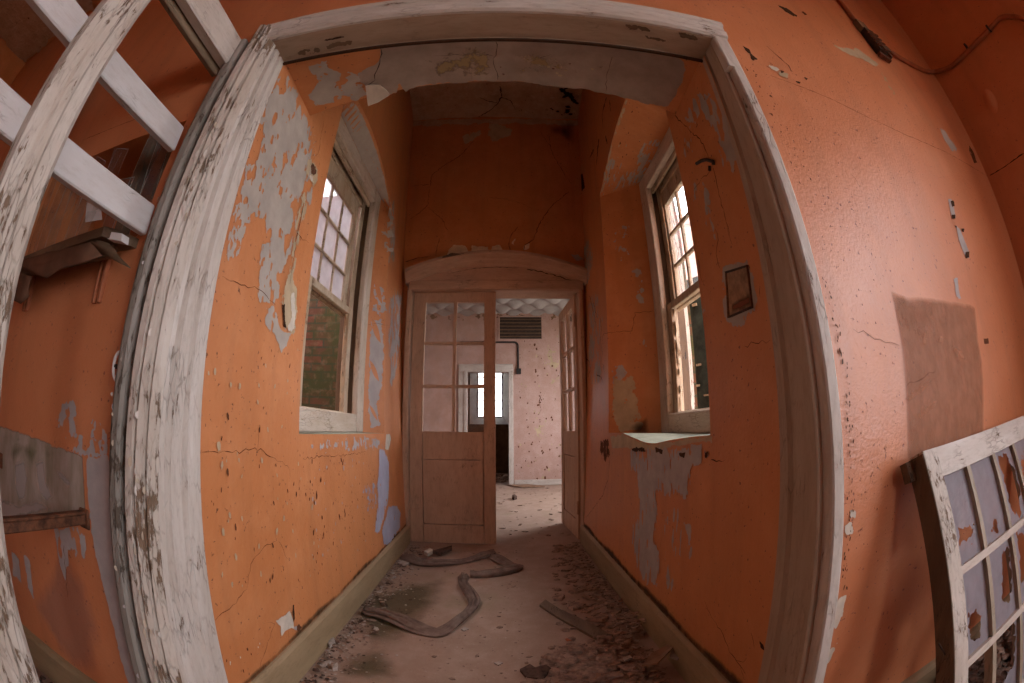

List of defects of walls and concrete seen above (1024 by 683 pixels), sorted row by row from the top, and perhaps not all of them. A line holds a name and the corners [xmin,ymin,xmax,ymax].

peeling [834,45,878,67]
peeling [226,36,686,367]
peeling [54,400,139,683]
peeling [254,284,402,581]
peeling [611,365,712,592]